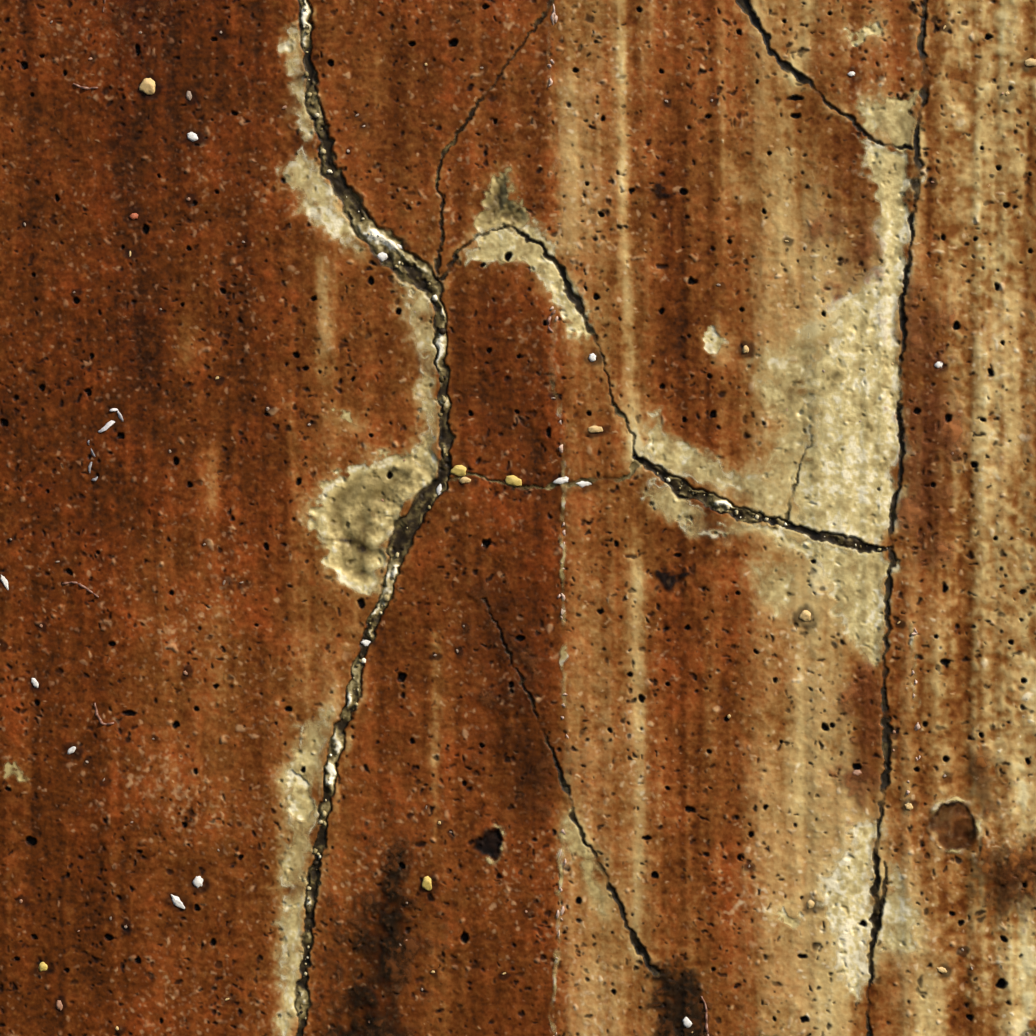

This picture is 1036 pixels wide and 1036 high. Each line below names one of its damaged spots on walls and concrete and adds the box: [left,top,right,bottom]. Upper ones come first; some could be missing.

corrosion [905,278,955,364]
corrosion [896,392,966,538]
crack [294,0,929,1036]
corrosion [971,836,1036,920]
water stain [655,996,697,1036]